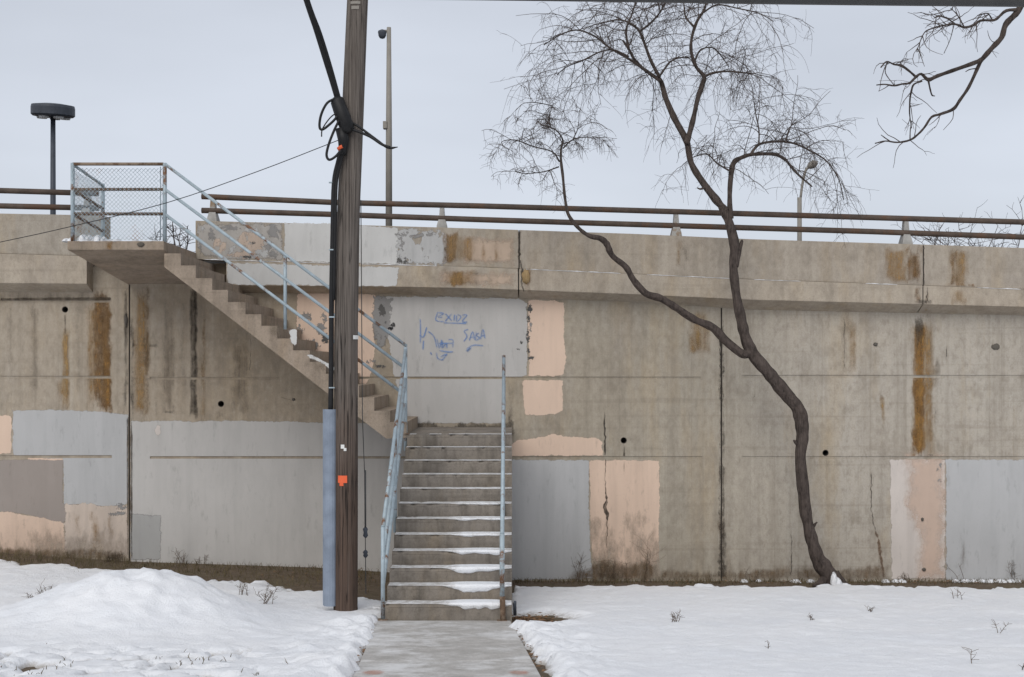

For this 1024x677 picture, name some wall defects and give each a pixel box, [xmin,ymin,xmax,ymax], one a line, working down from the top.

peeling [197,222,283,260]
peeling [395,228,449,266]
corrosion [444,234,484,285]
corrosion [888,252,919,280]
corrosion [88,295,110,405]
corrosion [136,298,148,409]
peeling [371,295,393,348]
corrosion [913,323,932,450]
crack [602,417,610,545]
crack [870,475,883,569]